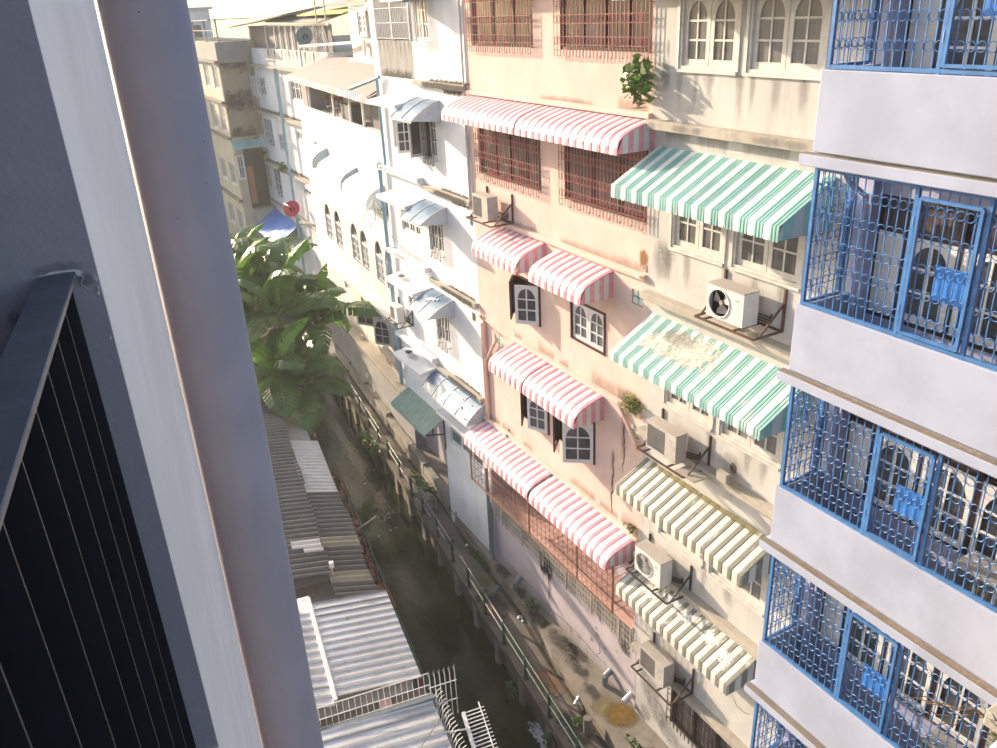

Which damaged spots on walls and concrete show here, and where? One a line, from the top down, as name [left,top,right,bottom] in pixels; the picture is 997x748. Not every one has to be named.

flaking render [35,269,89,290]
crack [610,423,625,513]
water stain [540,554,552,581]